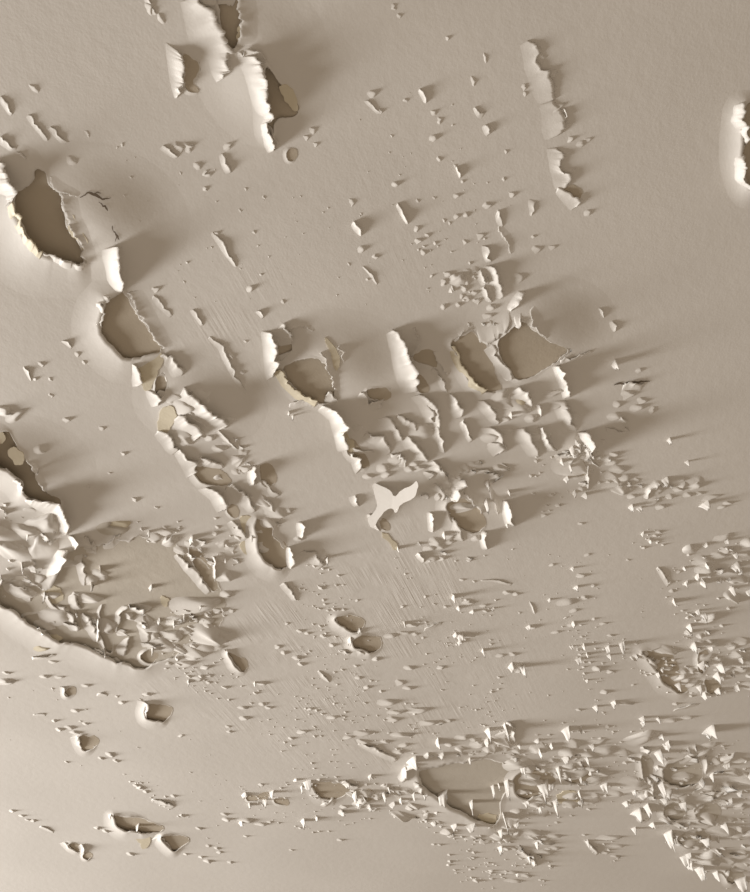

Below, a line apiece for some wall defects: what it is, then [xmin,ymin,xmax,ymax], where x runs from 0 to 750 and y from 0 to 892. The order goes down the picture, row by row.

peeling [144,0,165,24]
peeling [166,0,300,164]
peeling [482,202,515,254]
peeling [520,40,593,216]
peeling [719,90,750,209]
peeling [0,136,412,704]
peeling [261,233,721,589]
peeling [551,533,750,715]
peeling [33,713,119,762]
peeling [103,809,190,859]
peeling [135,692,174,730]
peeling [239,662,750,892]